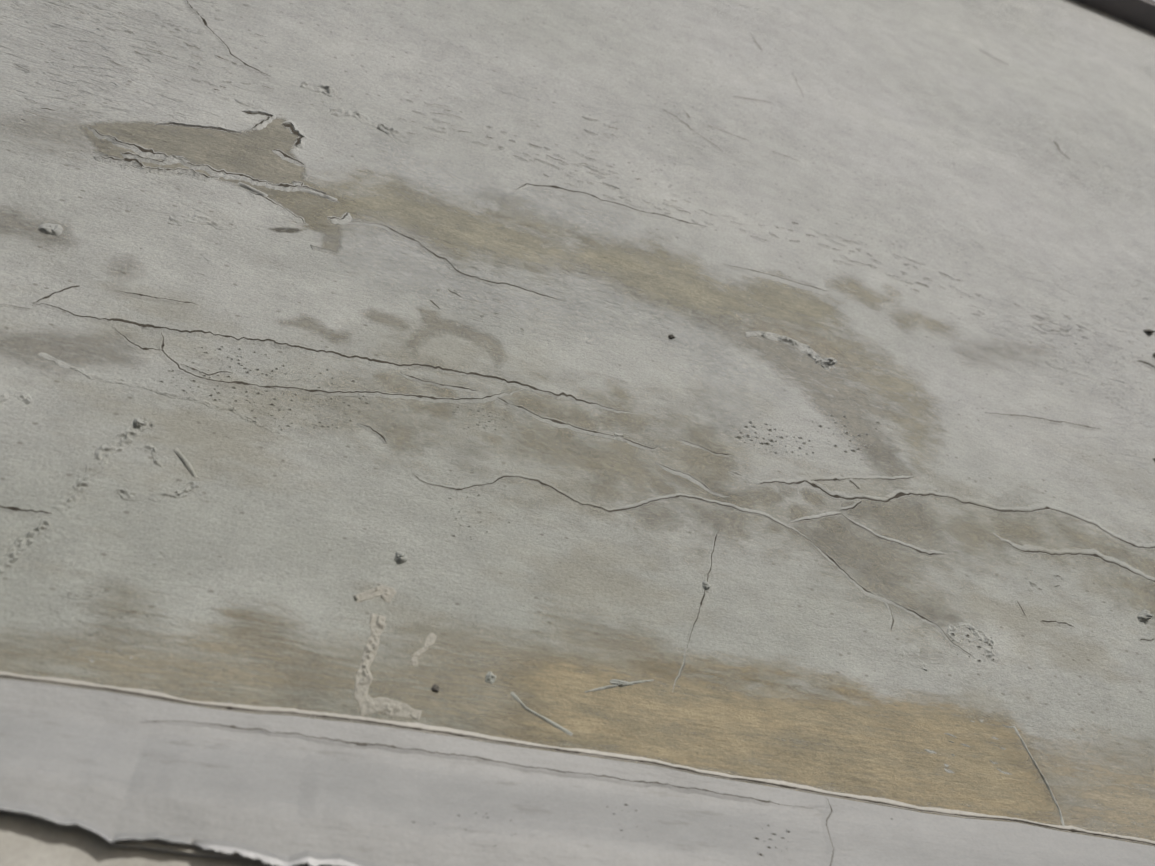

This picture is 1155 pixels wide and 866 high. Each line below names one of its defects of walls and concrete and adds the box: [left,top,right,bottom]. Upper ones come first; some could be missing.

peeling [80,25,369,254]
water stain [304,177,929,476]
crack [723,264,833,295]
crack [0,285,1155,692]
peeling [0,800,388,866]
water stain [57,613,1155,846]